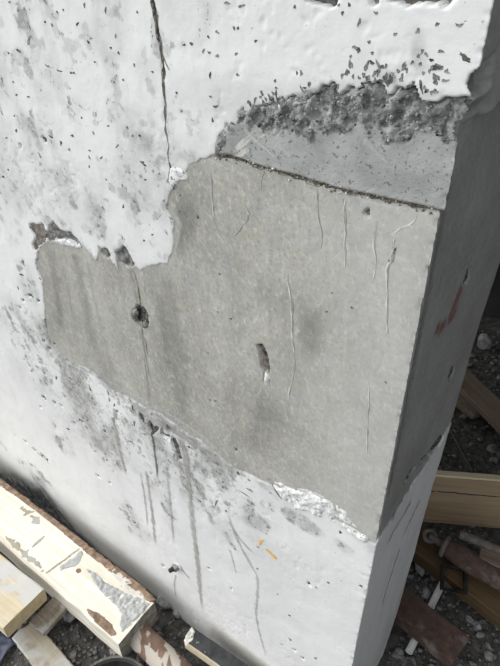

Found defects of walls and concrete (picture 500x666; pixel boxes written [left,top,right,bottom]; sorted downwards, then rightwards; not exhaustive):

crack [150,0,175,189]
spalling [247,79,284,112]
spalling [300,45,451,101]
crack [210,152,443,333]
spalling [30,119,457,543]
crack [286,274,296,399]
water stain [141,473,155,540]
water stain [177,446,202,604]